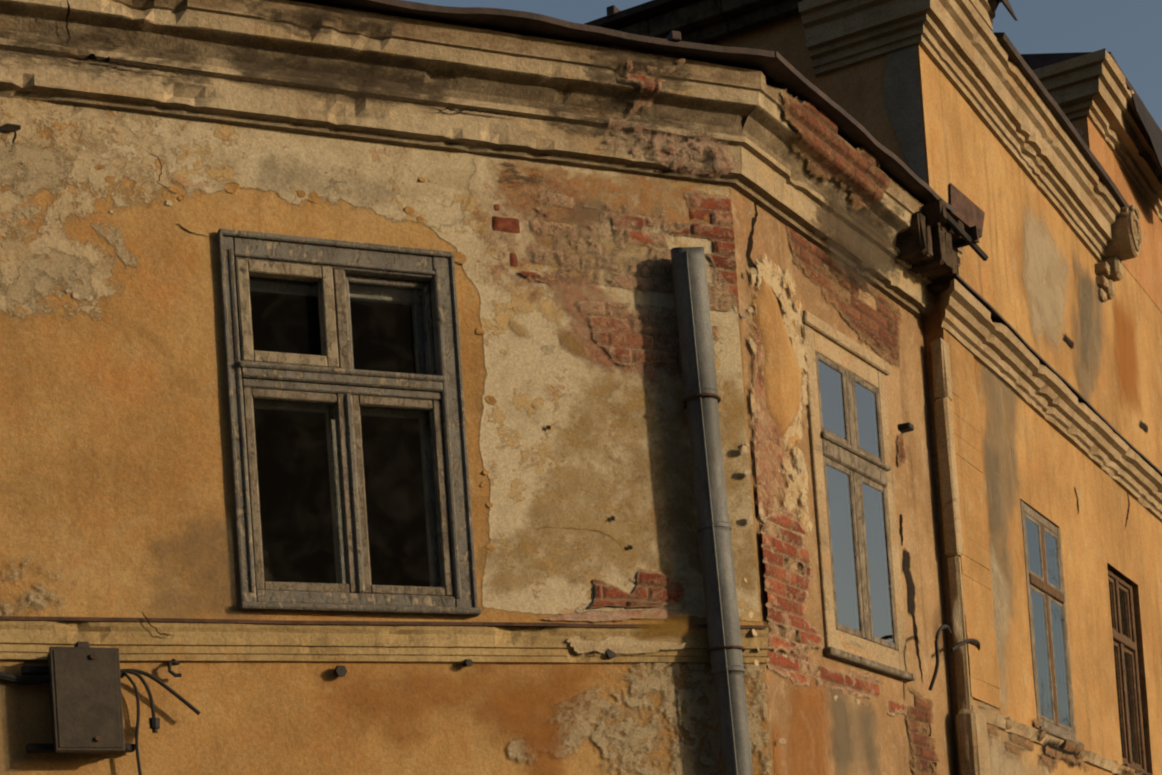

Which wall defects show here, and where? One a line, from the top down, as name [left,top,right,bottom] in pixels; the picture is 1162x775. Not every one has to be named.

water stain [0,28,215,84]
crack [66,0,186,75]
water stain [247,0,402,36]
water stain [236,36,451,107]
water stain [551,42,714,162]
peeling [0,45,939,775]